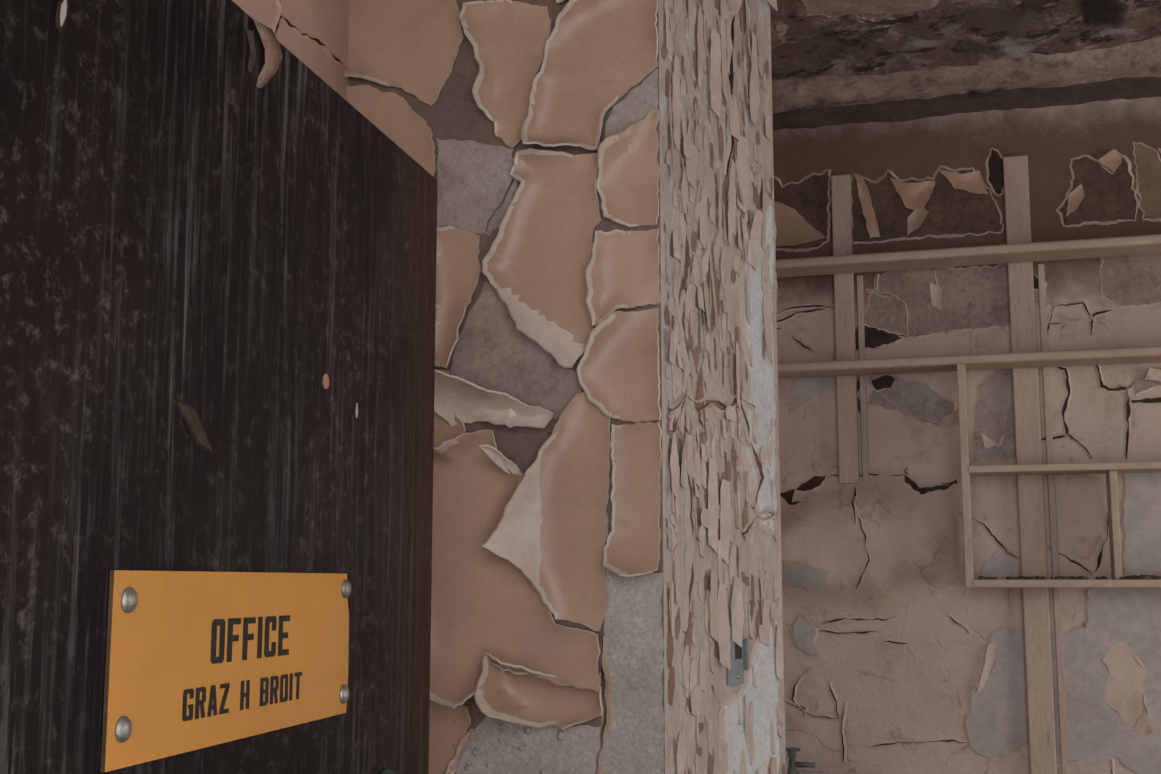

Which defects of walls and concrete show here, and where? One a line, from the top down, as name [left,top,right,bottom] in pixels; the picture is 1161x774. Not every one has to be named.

peeling [55,0,69,33]
leakage [910,39,938,47]
leakage [999,37,1032,59]
leakage [1083,0,1125,26]
peeling [850,148,1004,244]
peeling [1056,142,1161,227]
peeling [344,0,837,774]
crack [817,467,961,646]
crack [973,512,1109,576]
crack [947,614,971,635]
peeling [1050,472,1161,774]
crack [784,675,968,762]